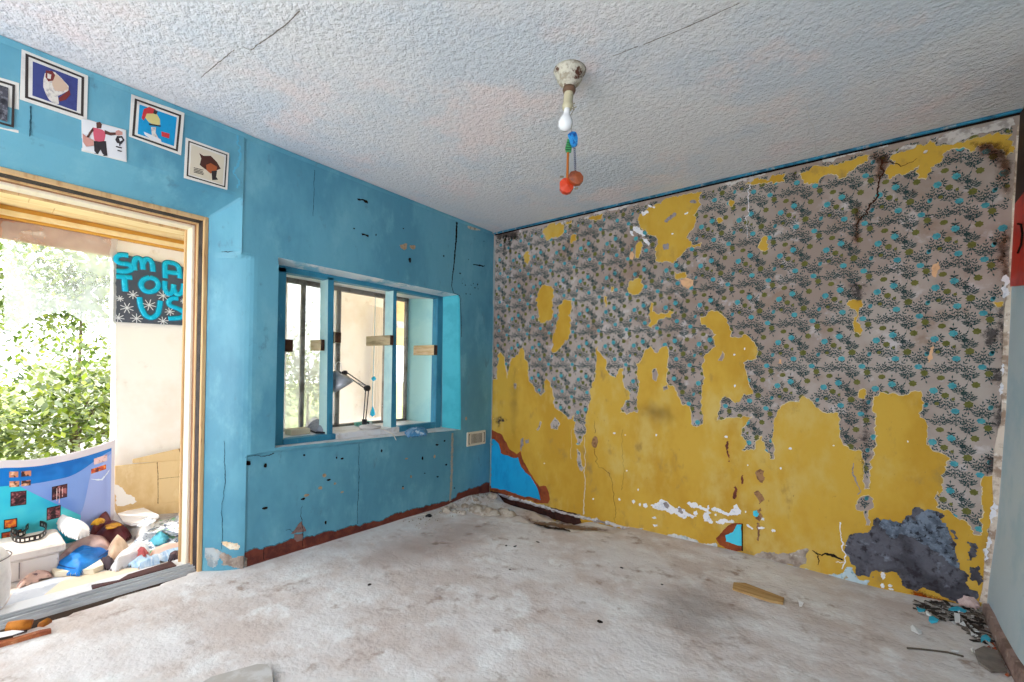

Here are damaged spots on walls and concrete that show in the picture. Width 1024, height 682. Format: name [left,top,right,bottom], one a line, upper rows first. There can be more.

crack [202,11,300,77]
peeling [723,118,1015,207]
crack [856,159,916,231]
water stain [978,142,1010,192]
crack [451,222,462,337]
peeling [535,284,572,353]
peeling [542,192,702,280]
peeling [993,275,1010,308]
water stain [995,233,1010,275]
crack [221,442,274,549]
peeling [205,310,998,653]
crack [812,522,847,569]